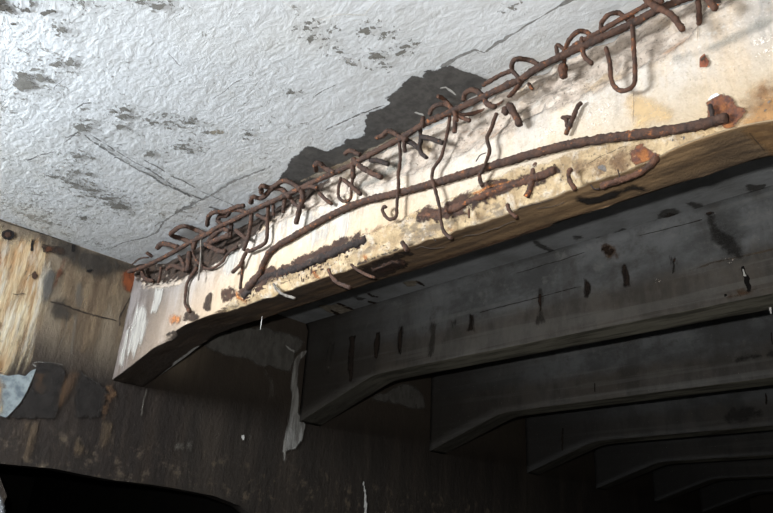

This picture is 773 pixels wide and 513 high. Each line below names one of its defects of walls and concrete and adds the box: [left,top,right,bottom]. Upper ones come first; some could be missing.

peeling [0,0,73,41]
peeling [66,0,191,25]
crack [441,0,573,67]
peeling [69,115,103,137]
crack [27,132,270,249]
peeling [104,102,224,161]
spalling [127,0,733,313]
rust [416,164,560,228]
rust [576,185,644,205]
rust [575,143,660,174]
rust [706,87,773,155]
rust [170,231,367,323]